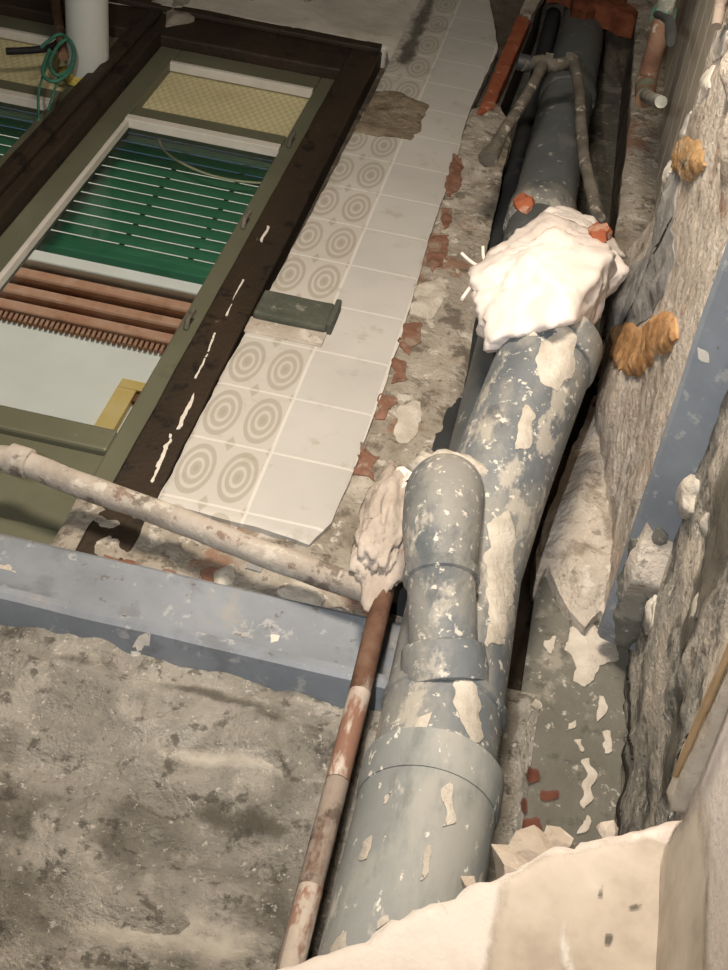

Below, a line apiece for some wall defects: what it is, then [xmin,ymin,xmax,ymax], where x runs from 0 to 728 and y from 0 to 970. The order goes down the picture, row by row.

spalling [353,91,429,140]
spalling [391,153,464,384]
spalling [375,393,422,445]
spalling [353,442,380,481]
crack [616,665,634,836]